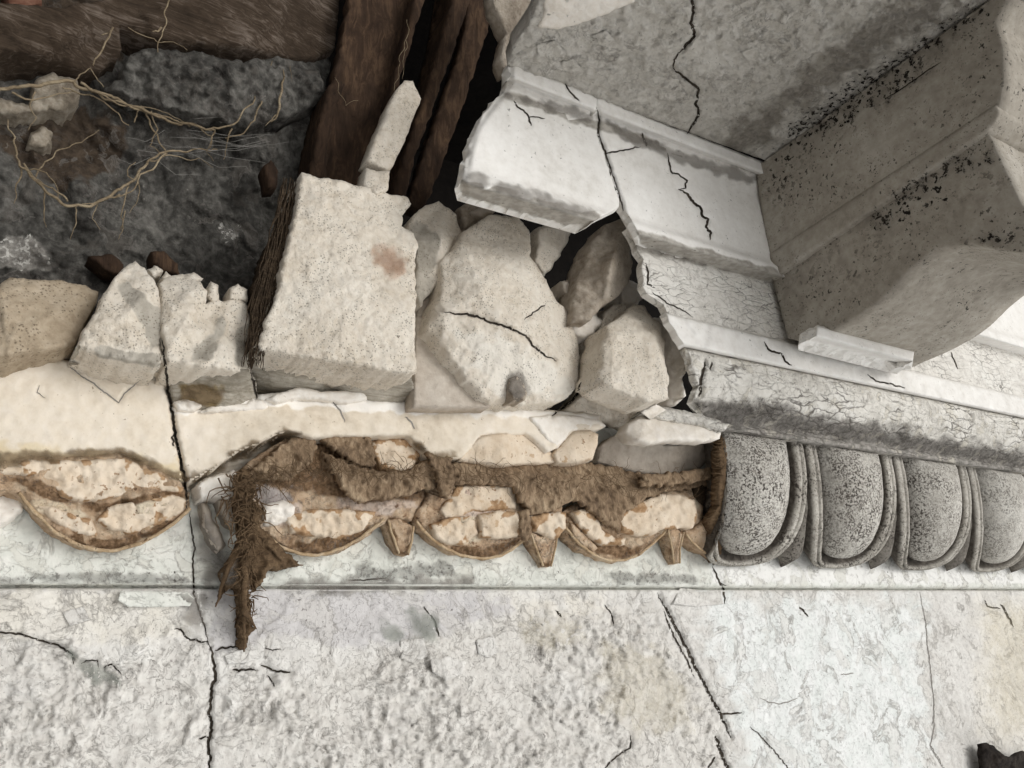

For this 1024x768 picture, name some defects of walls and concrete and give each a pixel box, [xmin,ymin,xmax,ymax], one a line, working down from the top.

crack [514,101,545,126]
crack [565,84,647,211]
crack [672,0,700,134]
crack [668,156,712,240]
water stain [778,2,990,157]
water stain [870,143,992,230]
crack [445,305,556,361]
peeling [529,414,606,450]
crack [162,341,290,768]
crack [658,594,797,768]
crack [921,599,943,768]